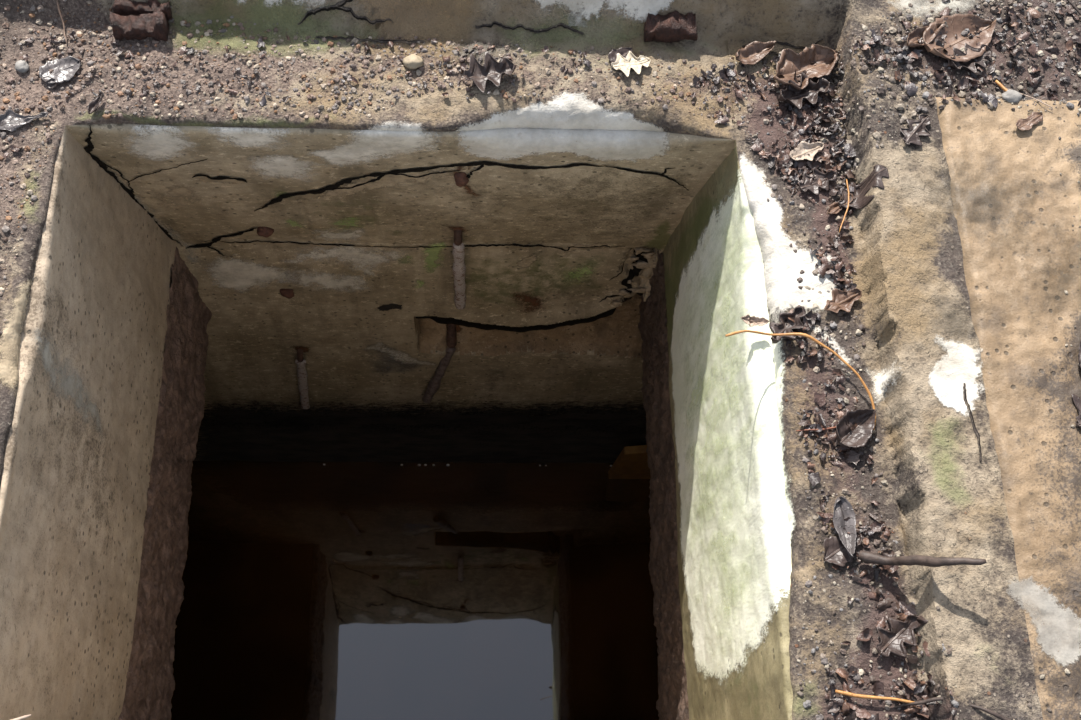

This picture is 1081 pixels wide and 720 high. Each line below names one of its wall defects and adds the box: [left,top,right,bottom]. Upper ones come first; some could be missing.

crack [297,0,425,45]
crack [475,21,584,35]
crack [84,125,688,333]
spalling [414,247,659,359]